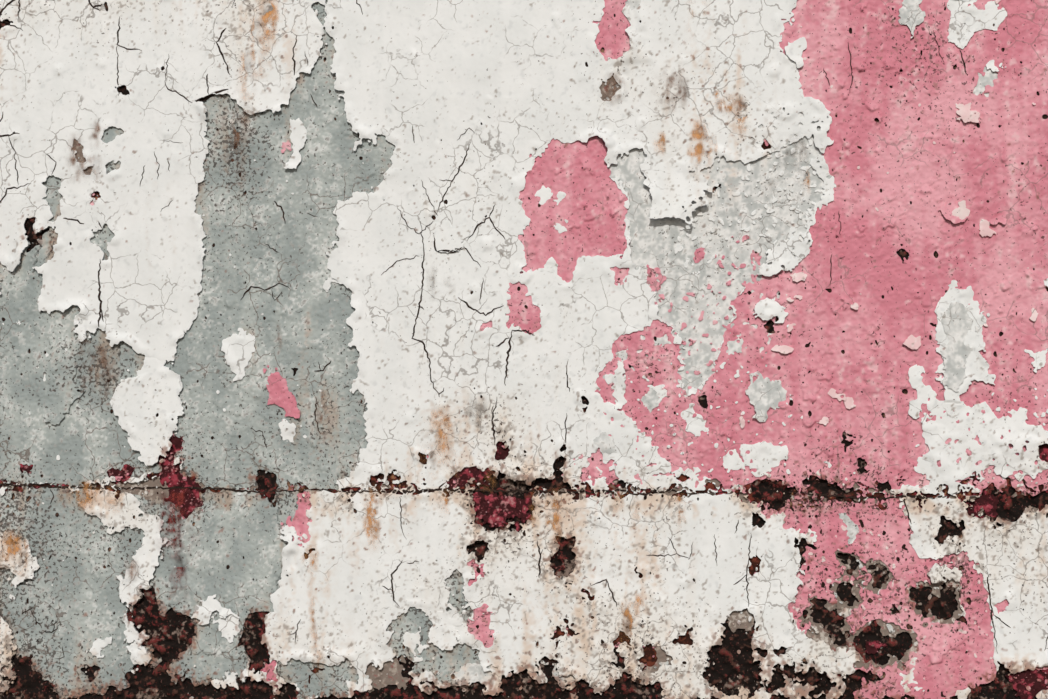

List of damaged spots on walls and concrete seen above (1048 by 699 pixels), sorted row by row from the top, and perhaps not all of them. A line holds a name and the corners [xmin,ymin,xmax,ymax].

crack [165,0,235,103]
crack [97,260,105,330]
crack [381,128,505,395]
peeling [506,134,825,437]
peeling [0,0,693,699]
crack [491,330,533,445]
rust [0,479,122,504]
rust [287,480,430,538]
rust [532,482,657,529]
rust [795,471,980,508]
spalling [934,482,1048,544]
spalling [695,475,967,699]